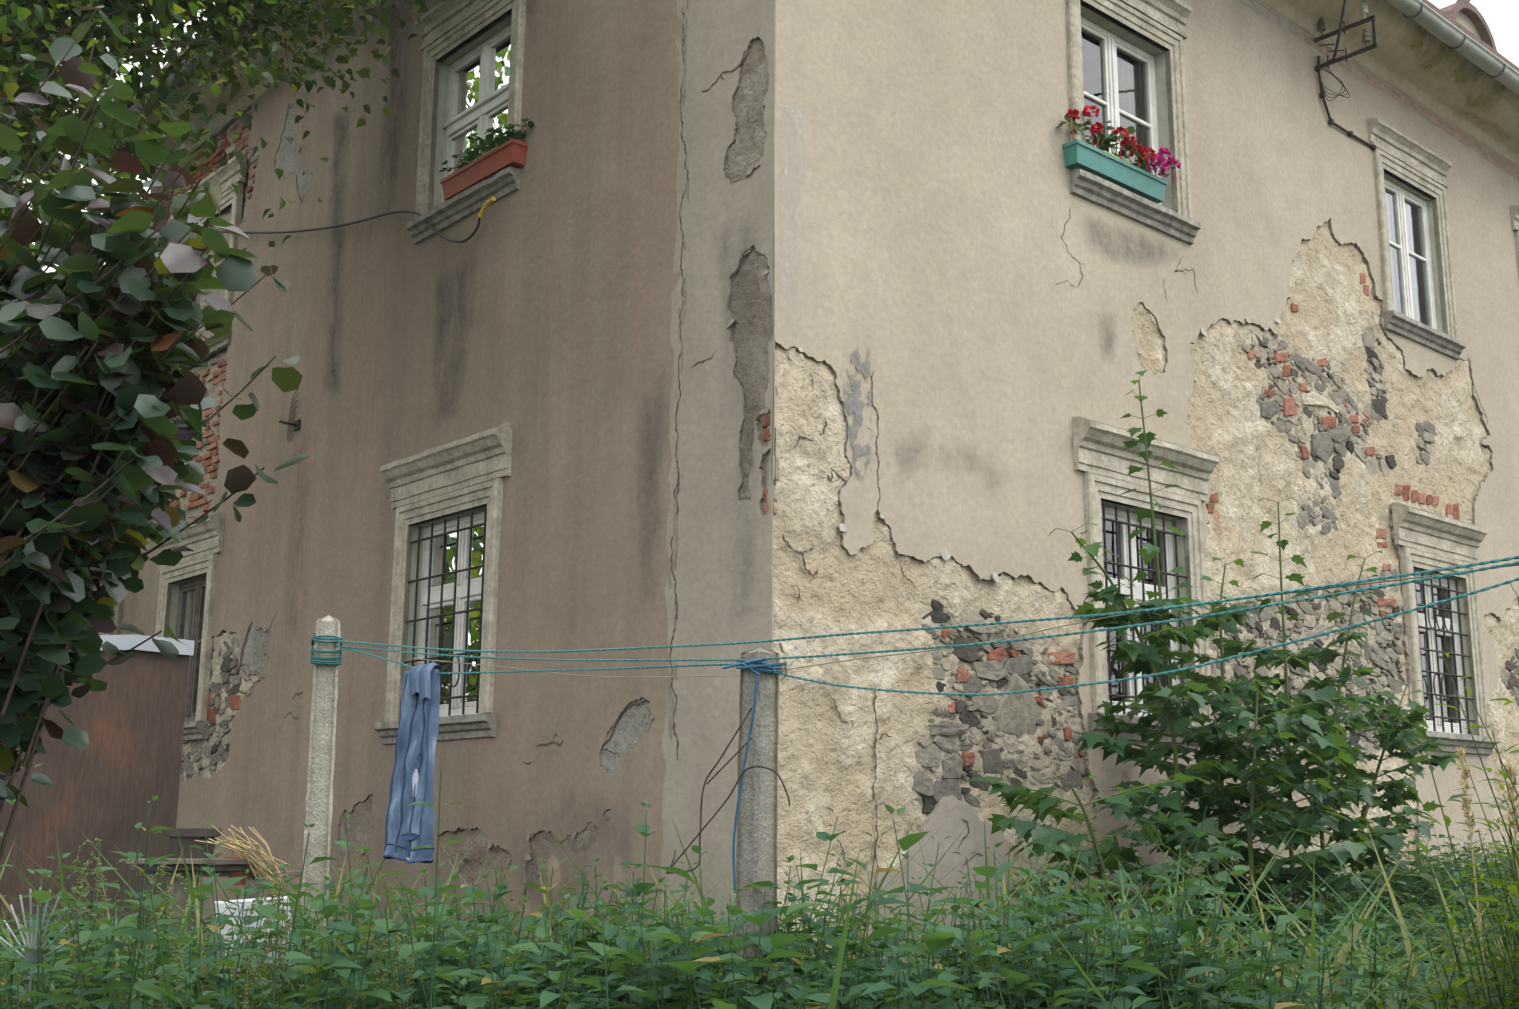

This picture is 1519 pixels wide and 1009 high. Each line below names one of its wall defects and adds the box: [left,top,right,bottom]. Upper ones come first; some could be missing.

spalling [723,37,770,185]
crack [601,0,746,760]
crack [731,245,761,275]
spalling [1131,302,1168,375]
spalling [725,246,1102,968]
spalling [1185,218,1494,910]
spalling [180,622,270,781]
crack [524,733,563,765]
spalling [599,697,654,779]
spalling [1484,597,1519,856]